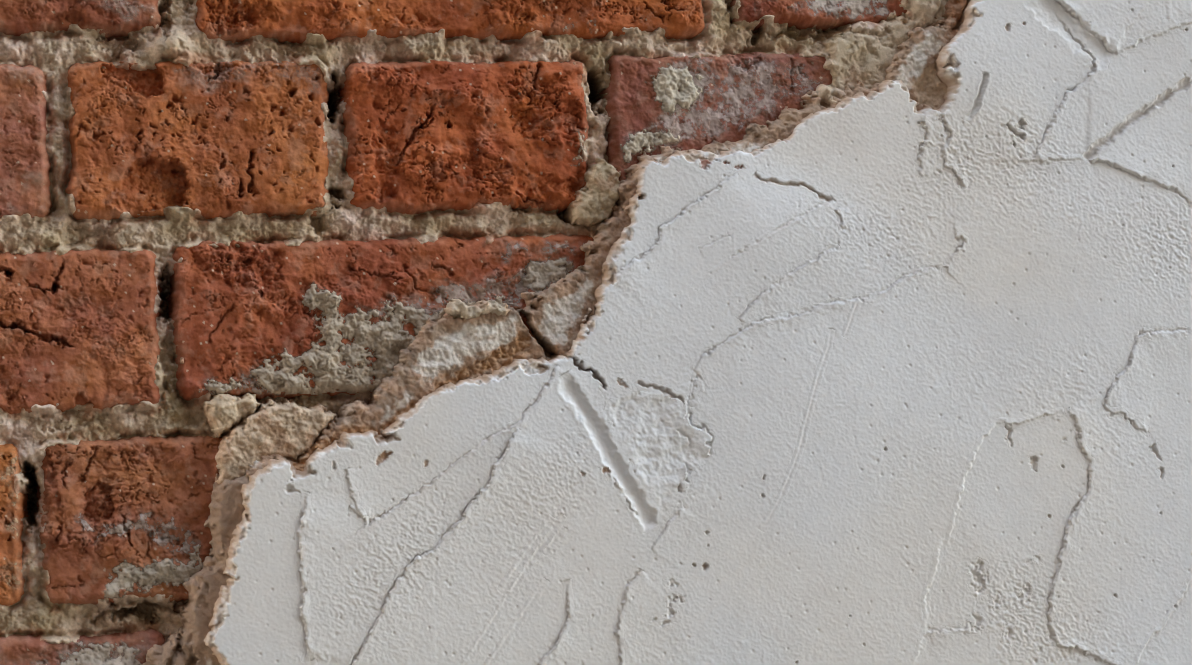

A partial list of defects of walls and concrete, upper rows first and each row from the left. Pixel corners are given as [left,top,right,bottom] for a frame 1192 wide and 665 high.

crack [950,0,968,32]
spalling [104,129,193,218]
crack [234,150,261,199]
peeling [620,129,680,163]
crack [752,171,848,230]
crack [912,109,969,191]
crack [1004,118,1030,148]
spalling [182,240,291,301]
spalling [452,328,535,382]
crack [331,307,716,554]
spalling [552,368,715,534]
spalling [39,447,124,565]